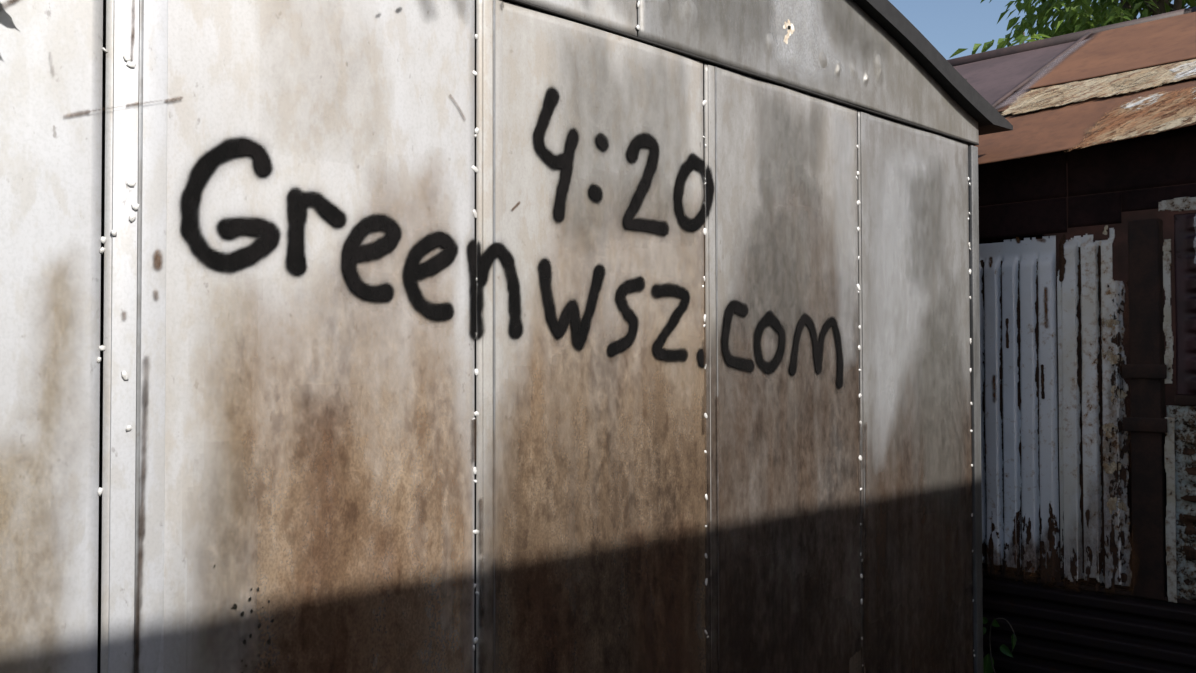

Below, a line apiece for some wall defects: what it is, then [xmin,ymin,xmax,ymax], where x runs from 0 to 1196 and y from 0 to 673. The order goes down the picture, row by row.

peeling [1001,58,1196,149]
corrosion [229,234,1126,673]
peeling [1102,281,1131,583]
corrosion [0,470,49,600]
peeling [1179,495,1196,561]